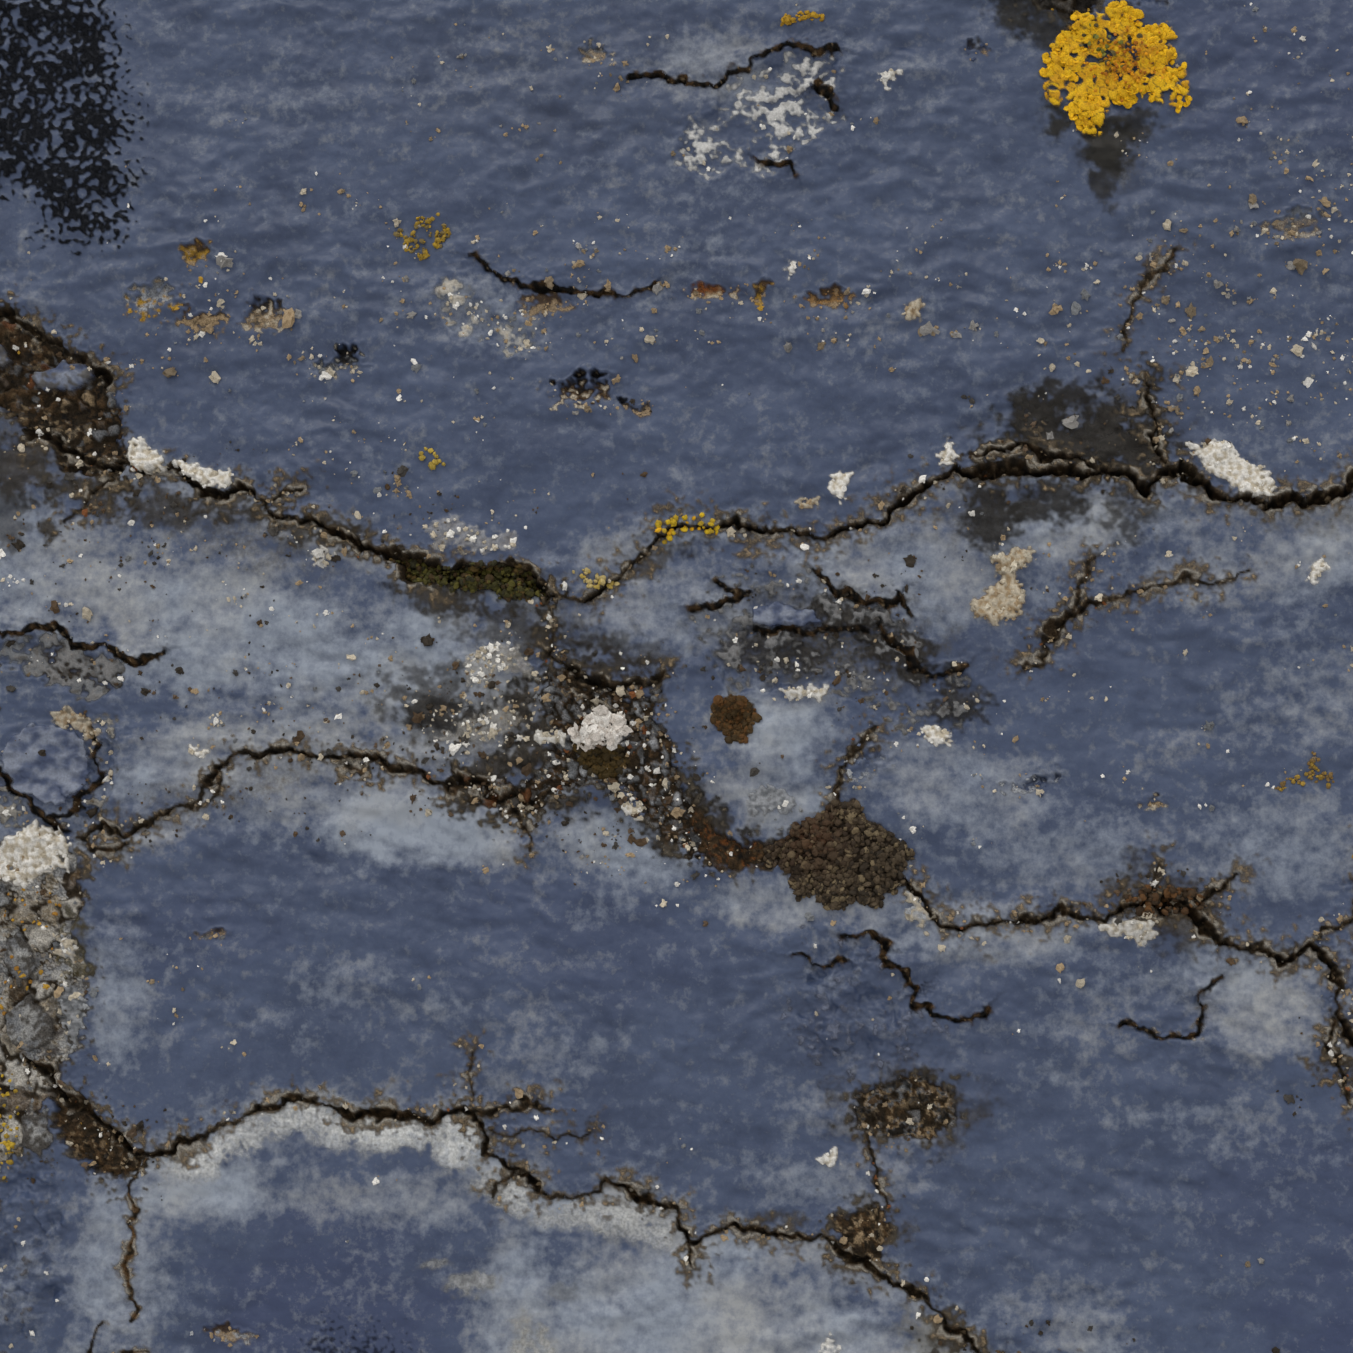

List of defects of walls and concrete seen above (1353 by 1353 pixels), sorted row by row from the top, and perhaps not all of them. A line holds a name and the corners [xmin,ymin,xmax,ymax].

crack [0,245,1353,743]
leakage [961,479,1158,626]
leakage [977,361,1277,499]
peeling [0,620,166,702]
crack [75,735,564,874]
crack [819,714,889,806]
spalling [0,714,147,1202]
crack [899,843,1353,1114]
crack [22,1034,987,1353]